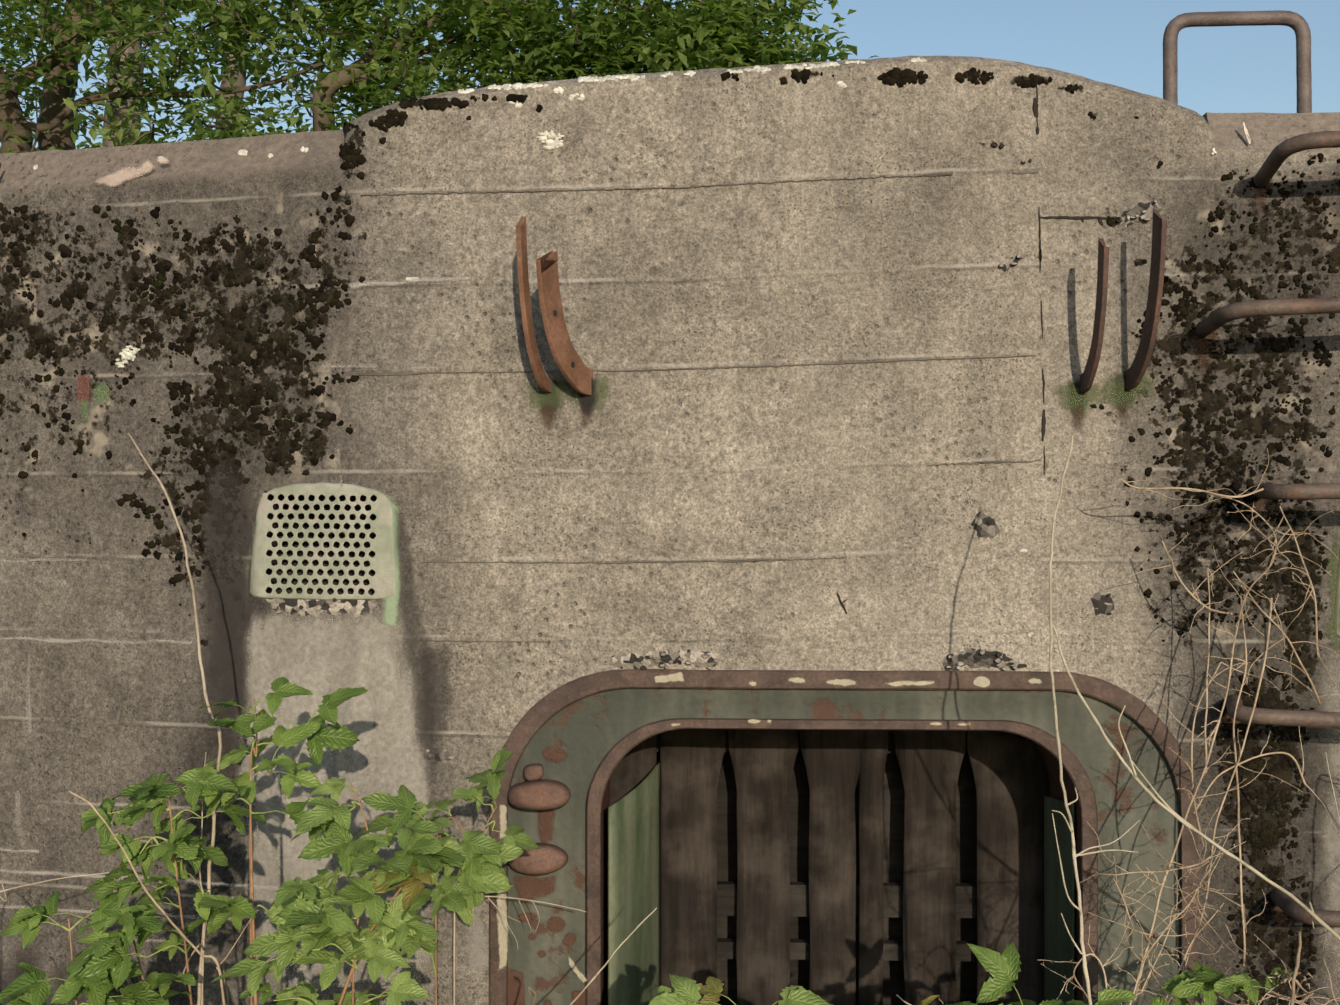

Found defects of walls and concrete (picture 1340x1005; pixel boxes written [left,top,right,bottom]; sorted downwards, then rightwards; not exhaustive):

damp [175,615,429,993]
rust [539,809,554,843]
damp [1325,729,1340,911]
damp [0,869,144,879]
damp [470,914,489,969]
peeling [497,894,508,969]
rust [514,876,576,957]
rust [508,968,525,1005]
peeling [568,958,587,982]
rust [572,990,586,1005]